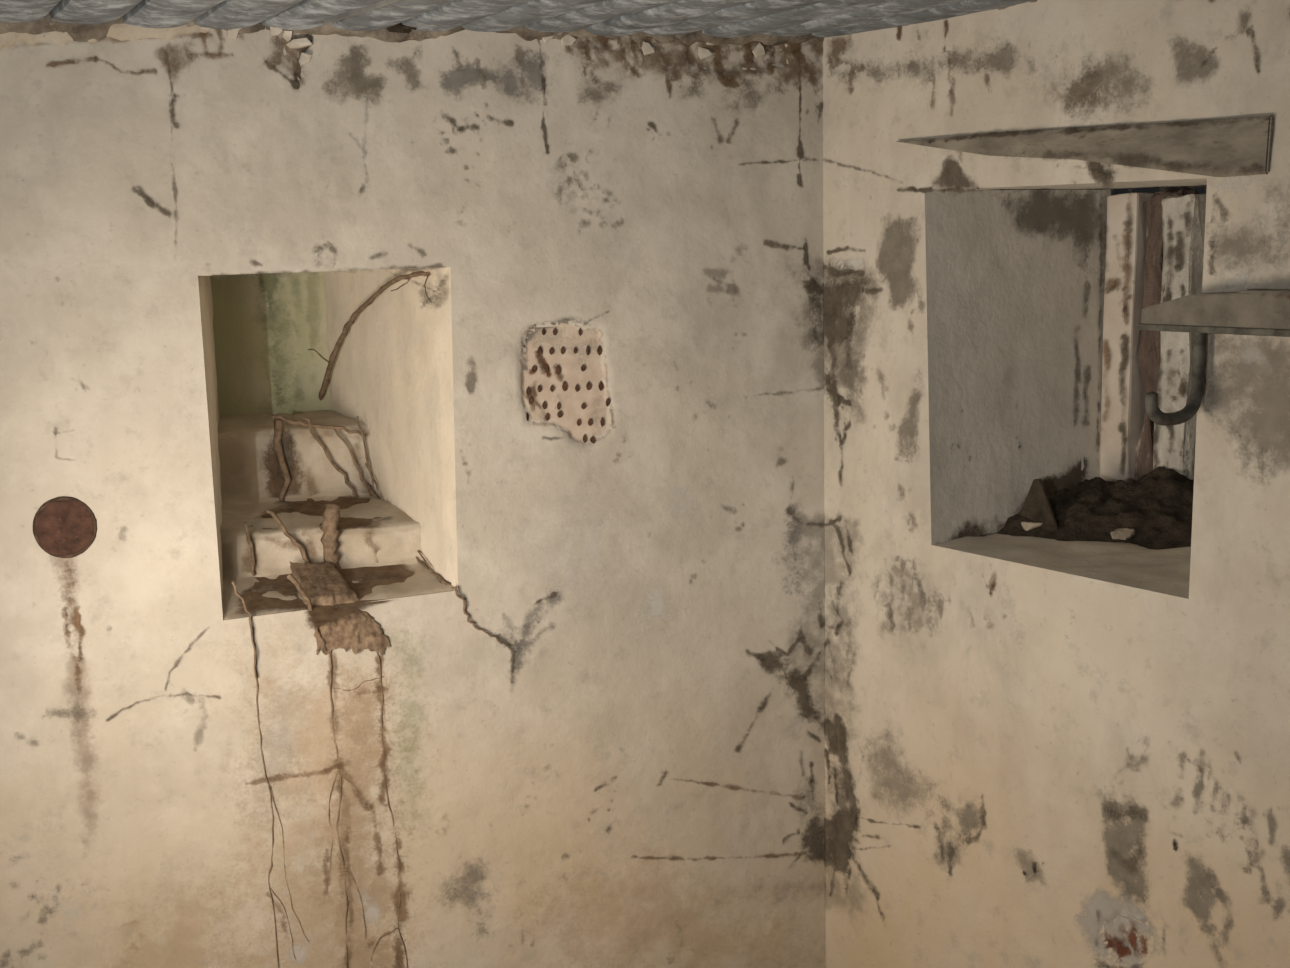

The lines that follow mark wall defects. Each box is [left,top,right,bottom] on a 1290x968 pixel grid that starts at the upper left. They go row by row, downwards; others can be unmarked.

leakage [326,47,383,100]
leakage [441,21,1014,108]
leakage [447,115,513,131]
spalling [520,318,613,444]
leakage [764,220,923,482]
leakage [787,507,852,595]
rust [63,607,84,690]
leakage [746,615,882,915]
leakage [935,804,986,874]
leakage [1102,801,1147,899]
spalling [1077,891,1154,968]
leakage [1185,858,1233,939]